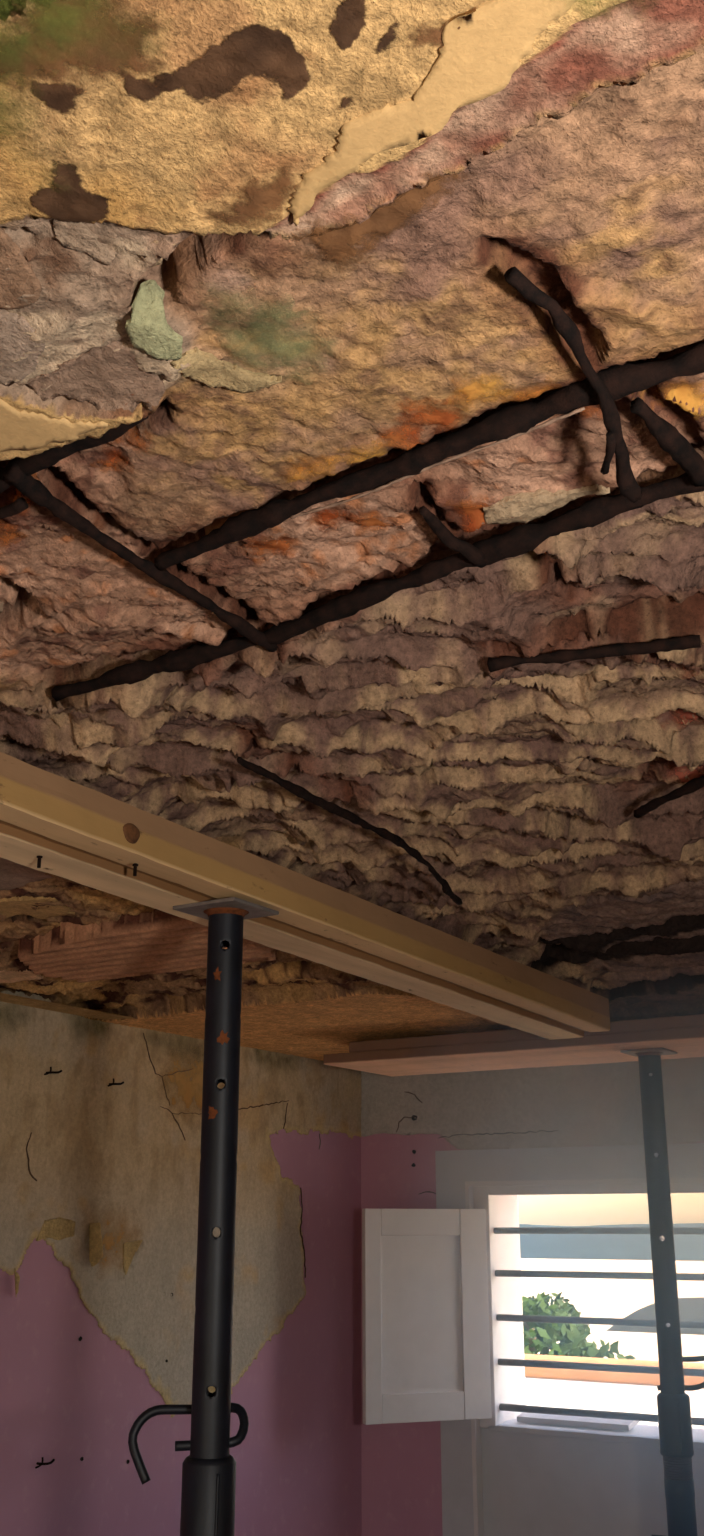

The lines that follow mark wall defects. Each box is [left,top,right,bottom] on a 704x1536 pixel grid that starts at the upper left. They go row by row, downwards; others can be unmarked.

peeling [0,0,311,115]
peeling [330,0,366,50]
peeling [376,23,460,53]
corrosion [291,380,552,480]
spalling [0,49,704,1021]
corrosion [455,501,488,533]
peeling [0,873,704,1418]